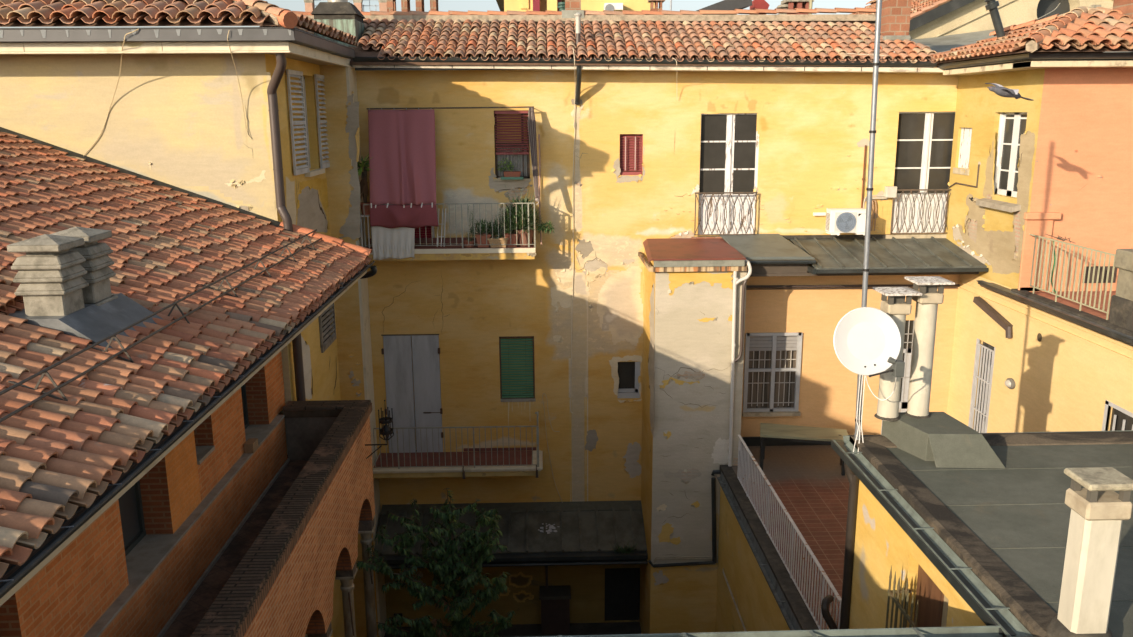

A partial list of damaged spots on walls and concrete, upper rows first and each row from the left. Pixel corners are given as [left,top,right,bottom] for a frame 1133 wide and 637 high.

peeling [43,91,361,241]
peeling [611,146,645,183]
peeling [952,130,1038,274]
peeling [436,152,705,403]